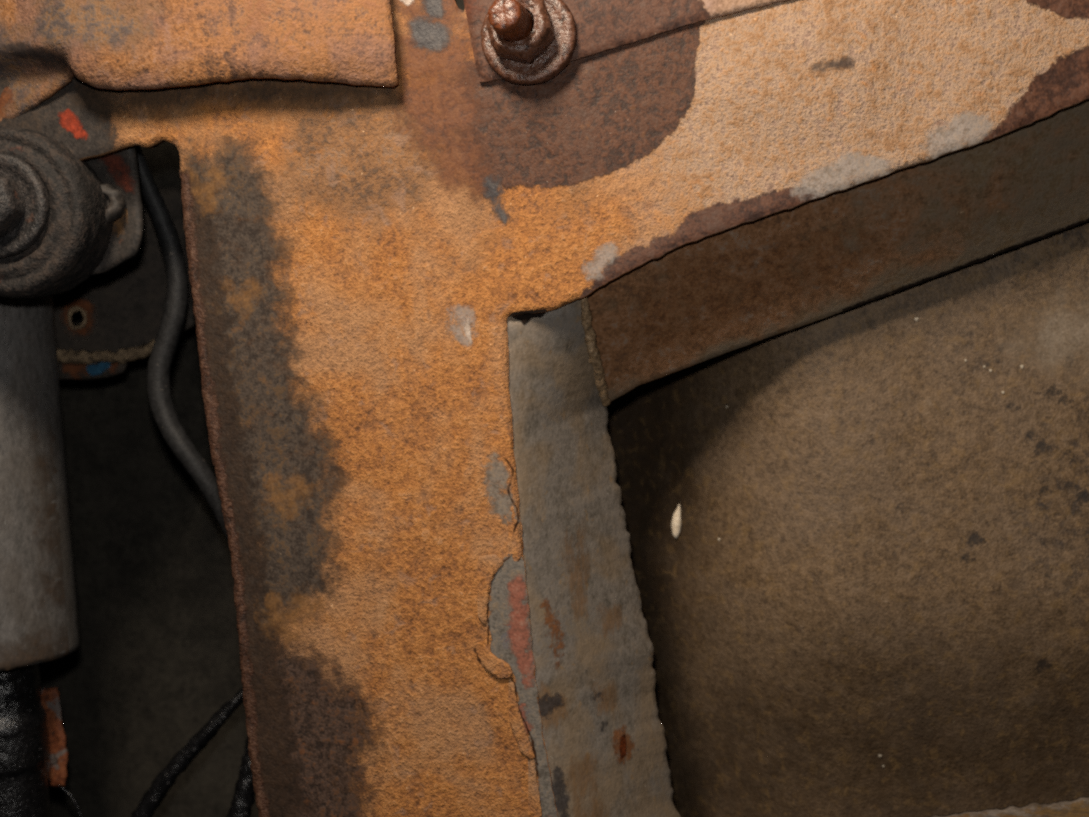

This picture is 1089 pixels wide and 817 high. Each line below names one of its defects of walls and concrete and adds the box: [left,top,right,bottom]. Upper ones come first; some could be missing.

rust [397,0,491,197]
rust [983,46,1089,141]
peeling [474,453,569,817]